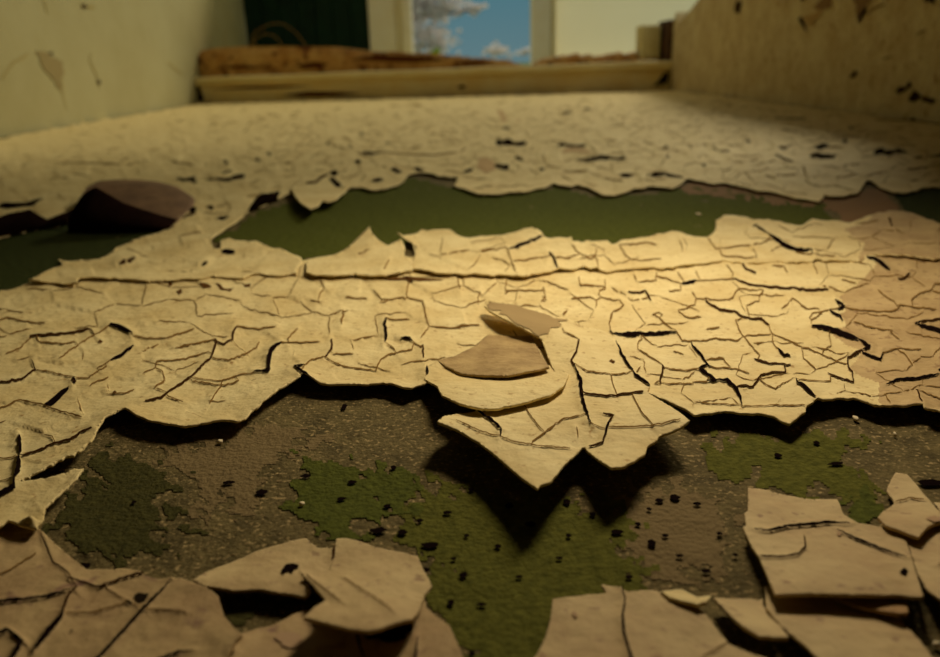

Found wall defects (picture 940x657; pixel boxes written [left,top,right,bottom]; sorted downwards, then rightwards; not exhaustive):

spalling [36,51,65,91]
spalling [895,81,936,104]
peeling [0,90,940,285]
crack [1,95,940,237]
peeling [0,210,940,657]